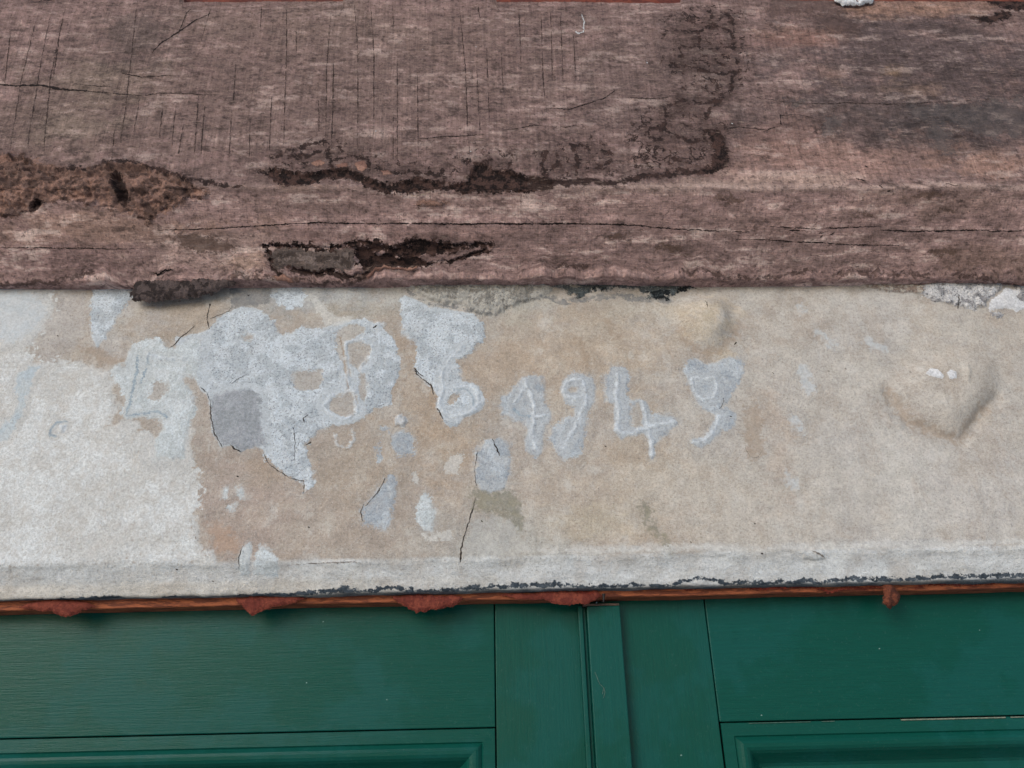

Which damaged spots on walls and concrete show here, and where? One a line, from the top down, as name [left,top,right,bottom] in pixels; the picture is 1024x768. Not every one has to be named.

crack [0,9,208,96]
peeling [309,157,394,178]
crack [1,221,1024,250]
spalling [858,283,1024,324]
peeling [0,289,409,592]
peeling [463,426,528,487]
crack [460,500,475,562]